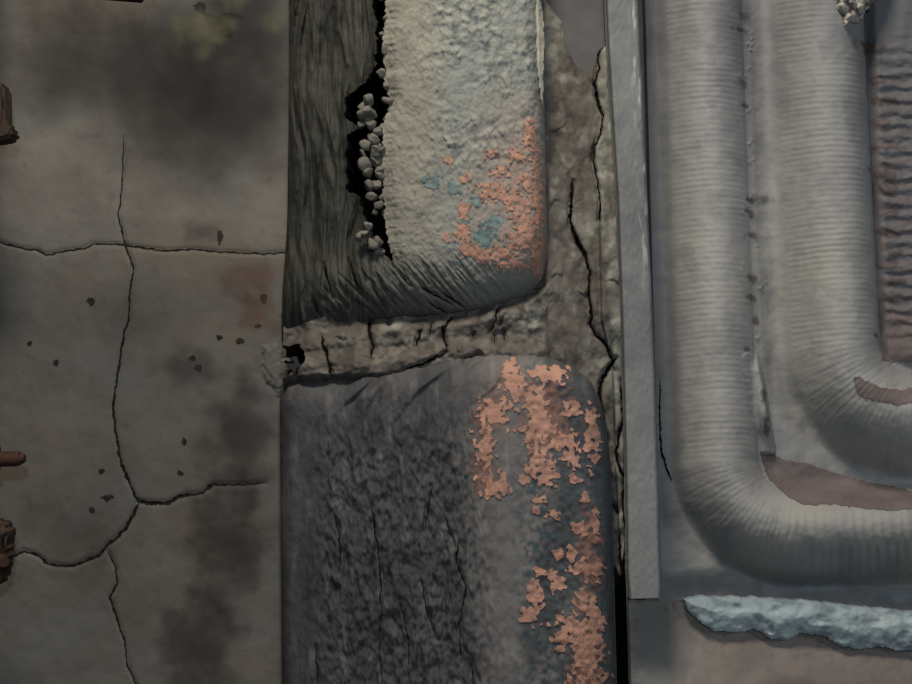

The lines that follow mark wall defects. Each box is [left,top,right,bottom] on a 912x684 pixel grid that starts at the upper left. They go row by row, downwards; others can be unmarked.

spalling [836,0,874,27]
spalling [355,68,394,256]
crack [592,47,604,220]
crack [0,140,285,684]
crack [314,264,344,377]
crack [349,260,367,289]
crack [367,321,390,360]
crack [400,275,506,369]
crack [568,181,625,585]
peeling [854,377,912,405]
peeling [760,450,912,511]